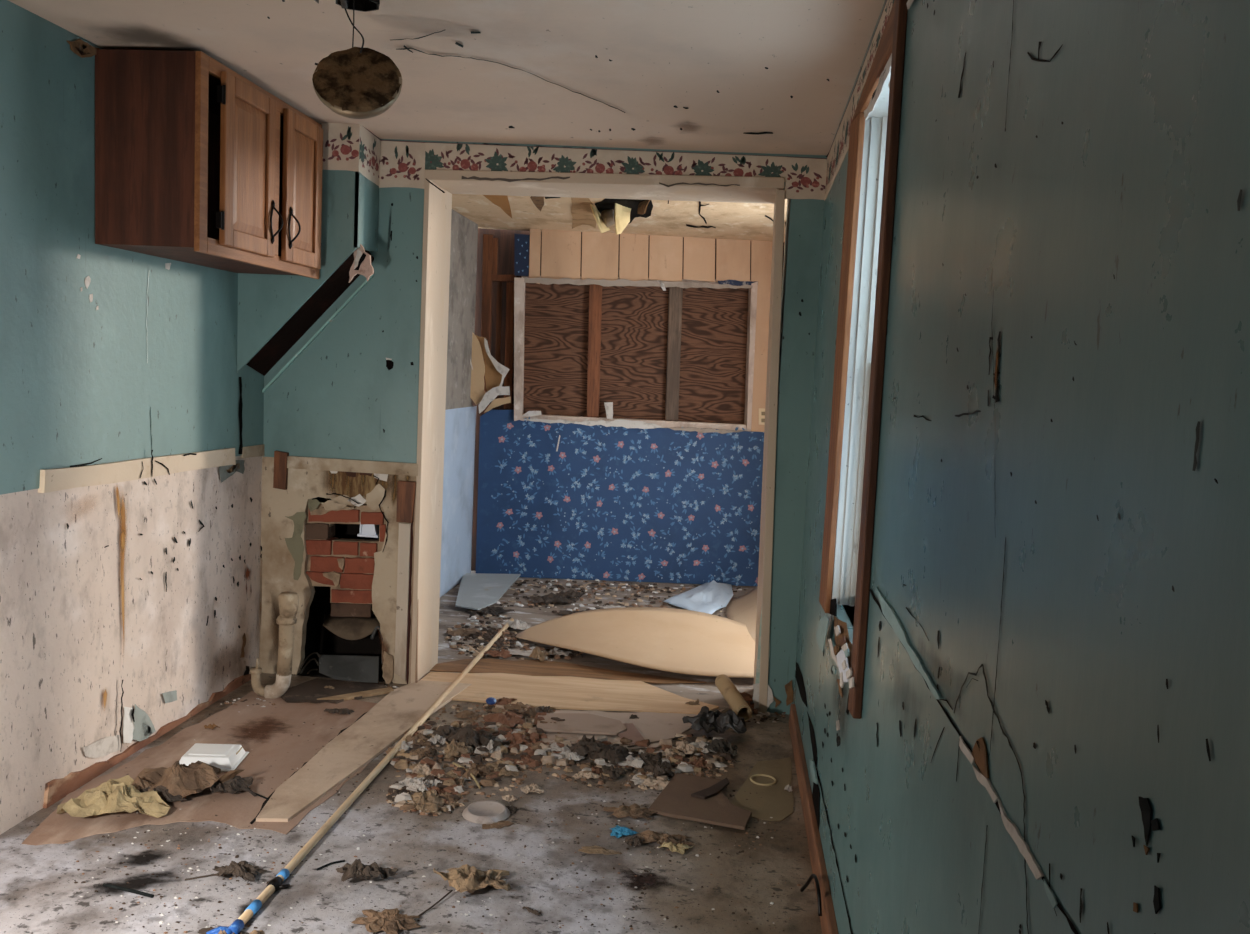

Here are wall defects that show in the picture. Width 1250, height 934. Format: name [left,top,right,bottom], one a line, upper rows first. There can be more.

spalling [219,460,245,483]
spalling [285,471,388,617]
crack [870,535,1078,934]
spalling [972,737,990,779]